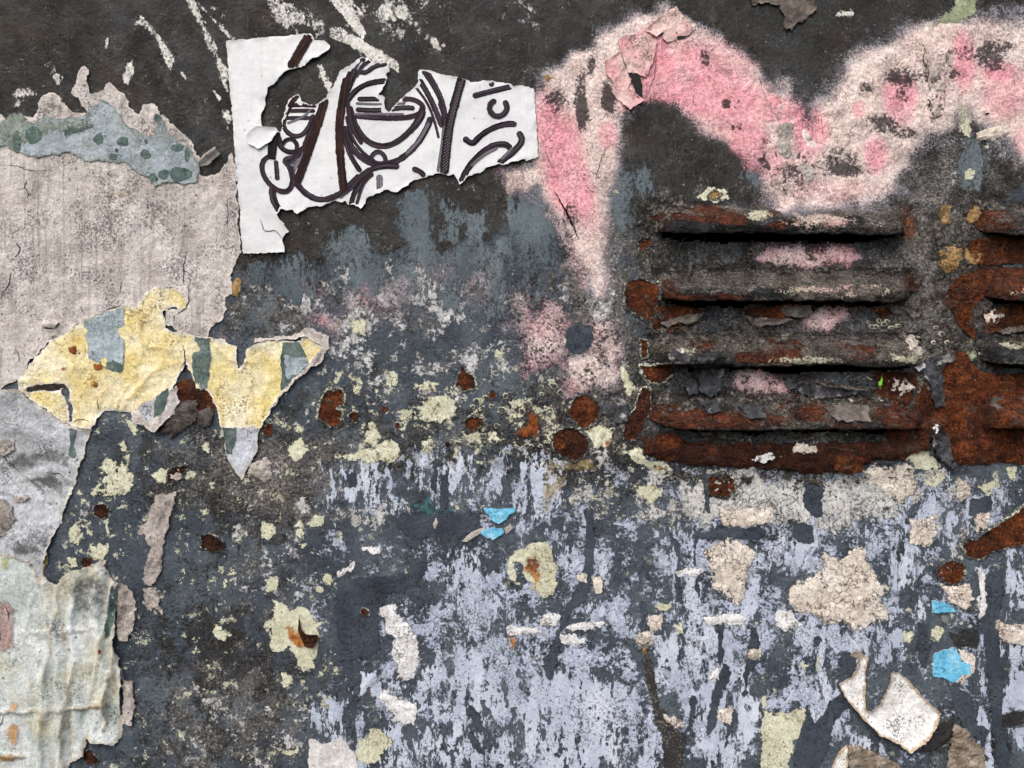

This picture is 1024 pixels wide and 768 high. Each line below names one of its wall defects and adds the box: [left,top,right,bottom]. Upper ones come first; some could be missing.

peeling [605,6,695,110]
rust [944,234,1024,341]
peeling [160,400,214,439]
rust [176,378,215,412]
rust [315,386,361,429]
rust [517,392,603,464]
rust [605,276,1024,500]
peeling [294,497,311,514]
rust [525,556,540,585]
peeling [319,424,1024,768]
rust [935,502,1024,587]
peeling [186,537,663,768]